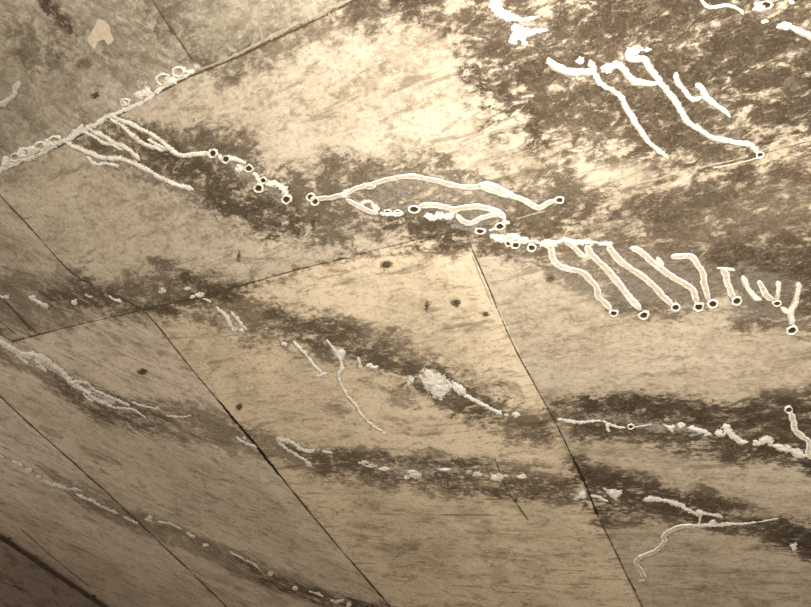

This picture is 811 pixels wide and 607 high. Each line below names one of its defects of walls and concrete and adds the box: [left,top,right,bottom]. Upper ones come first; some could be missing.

leakage [0,0,811,340]
leakage [0,336,160,418]
leakage [42,256,811,476]
leakage [0,454,195,538]
leakage [564,454,811,582]